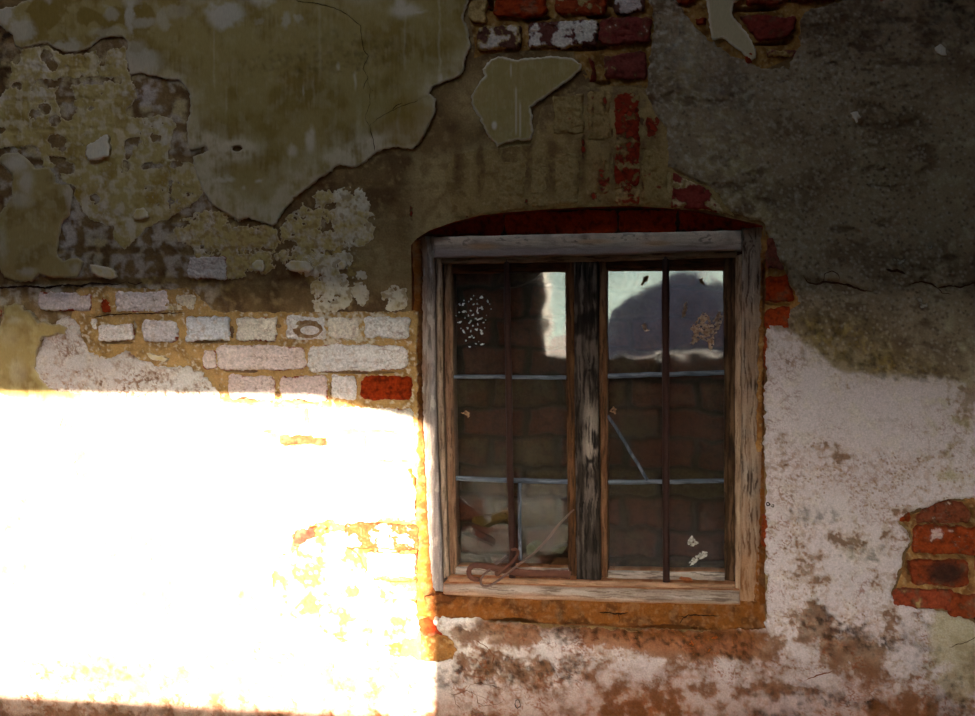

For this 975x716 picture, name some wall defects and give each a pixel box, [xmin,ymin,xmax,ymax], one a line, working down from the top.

spalling [676,0,837,69]
crack [297,0,418,150]
peeling [0,0,734,487]
crack [804,271,871,292]
crack [886,269,975,294]
spalling [279,514,457,661]
spalling [892,498,975,619]
water stain [802,603,887,651]
water stain [459,655,544,683]